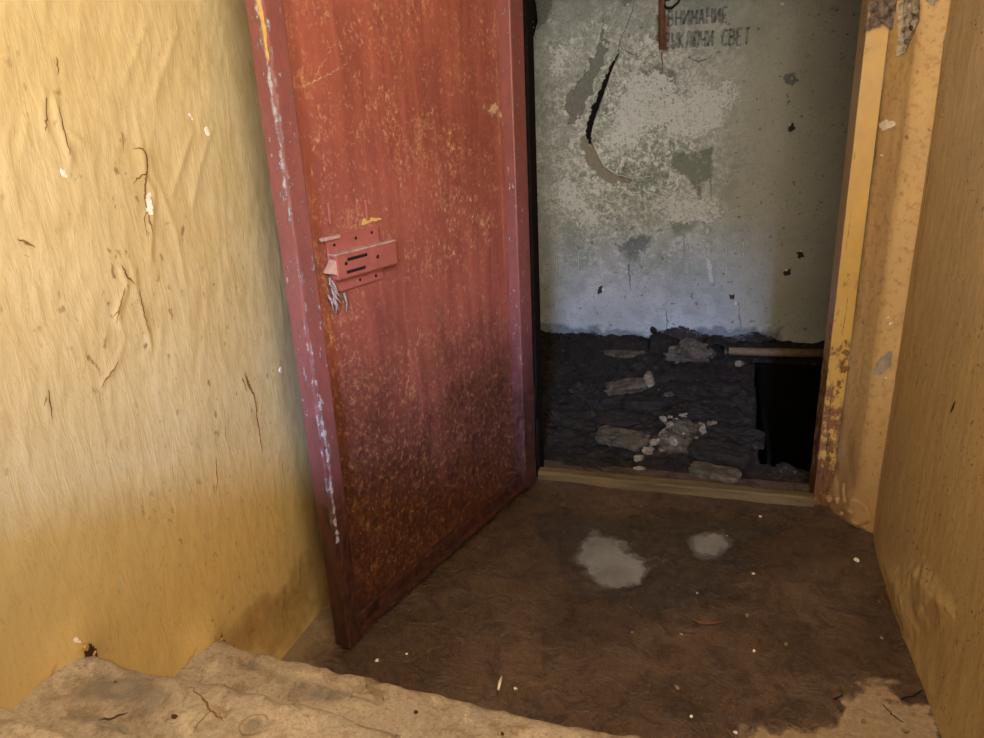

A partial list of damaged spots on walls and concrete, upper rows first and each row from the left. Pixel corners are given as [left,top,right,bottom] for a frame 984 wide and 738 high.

peeling [563,24,609,125]
crack [585,5,639,145]
flaking render [896,0,938,56]
flaking render [580,137,650,184]